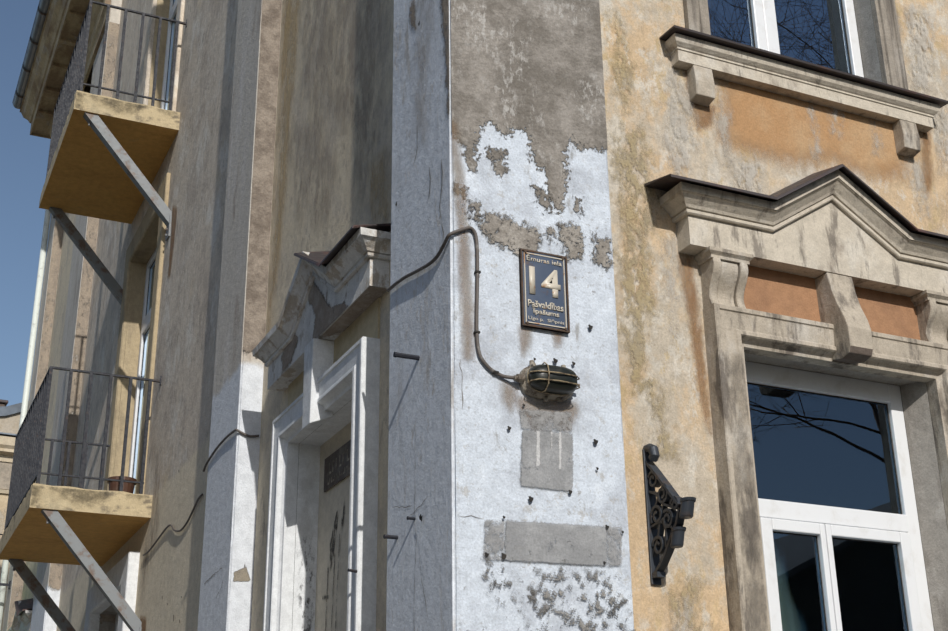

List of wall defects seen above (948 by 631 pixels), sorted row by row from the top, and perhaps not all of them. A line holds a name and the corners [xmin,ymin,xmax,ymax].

peeling [409,0,417,30]
leakage [665,73,693,176]
peeling [440,0,676,458]
peeling [482,557,635,631]